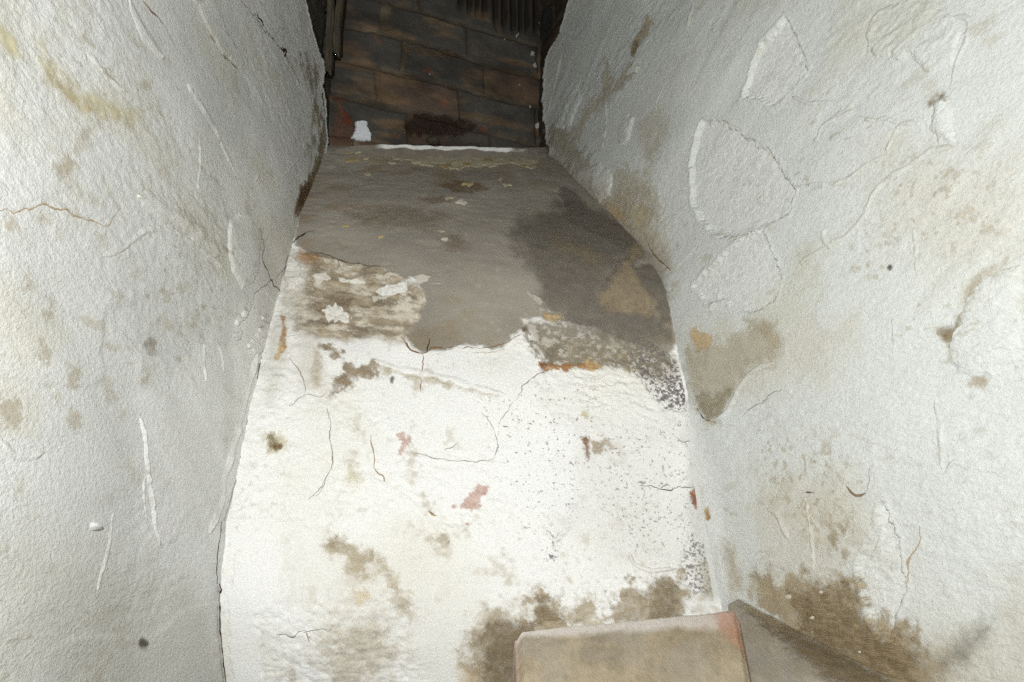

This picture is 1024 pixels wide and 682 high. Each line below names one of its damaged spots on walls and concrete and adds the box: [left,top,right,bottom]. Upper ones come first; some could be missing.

crack [0,203,121,228]
spalling [692,123,795,238]
peeling [321,302,352,323]
peeling [311,272,408,302]
peeling [401,291,669,375]
damp [514,188,687,410]
crack [412,371,545,463]
crack [641,485,692,495]
damp [467,535,711,682]
damp [744,569,939,682]